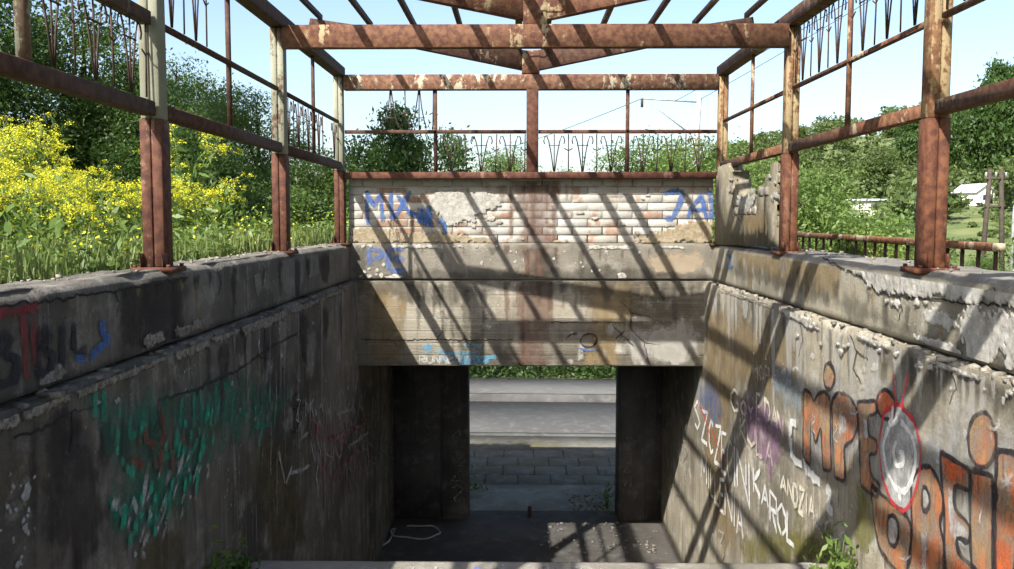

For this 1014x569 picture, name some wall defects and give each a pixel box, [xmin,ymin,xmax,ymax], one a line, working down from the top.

peeling [351,188,524,263]
peeling [728,178,755,212]
spalling [0,287,349,431]
crack [361,330,513,356]
water stain [580,281,631,365]
crack [551,301,660,367]
spalling [716,286,818,339]
spalling [810,334,899,390]
peeling [843,268,1014,370]
spalling [914,357,984,390]
peeling [6,472,36,536]